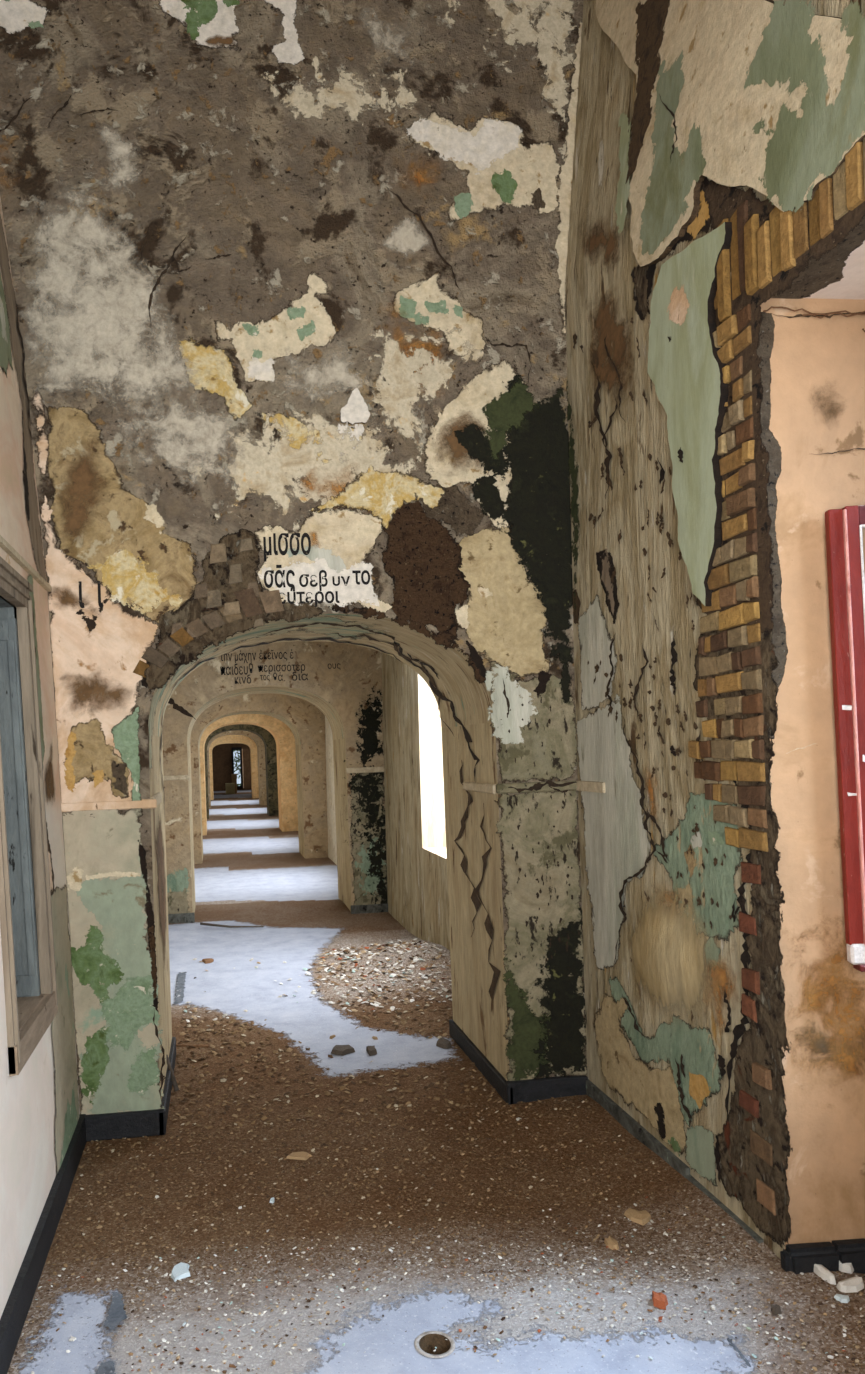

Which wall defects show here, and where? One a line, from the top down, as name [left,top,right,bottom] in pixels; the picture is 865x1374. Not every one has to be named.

flaking render [0,0,52,35]
flaking render [158,0,240,51]
flaking render [264,0,305,65]
flaking render [406,20,614,371]
crack [771,311,865,319]
leakage [452,375,580,703]
flaking render [0,215,651,1081]
flaking render [594,0,865,1248]
leakage [355,686,384,764]
peeling [46,808,166,1174]
leakage [803,943,865,1075]